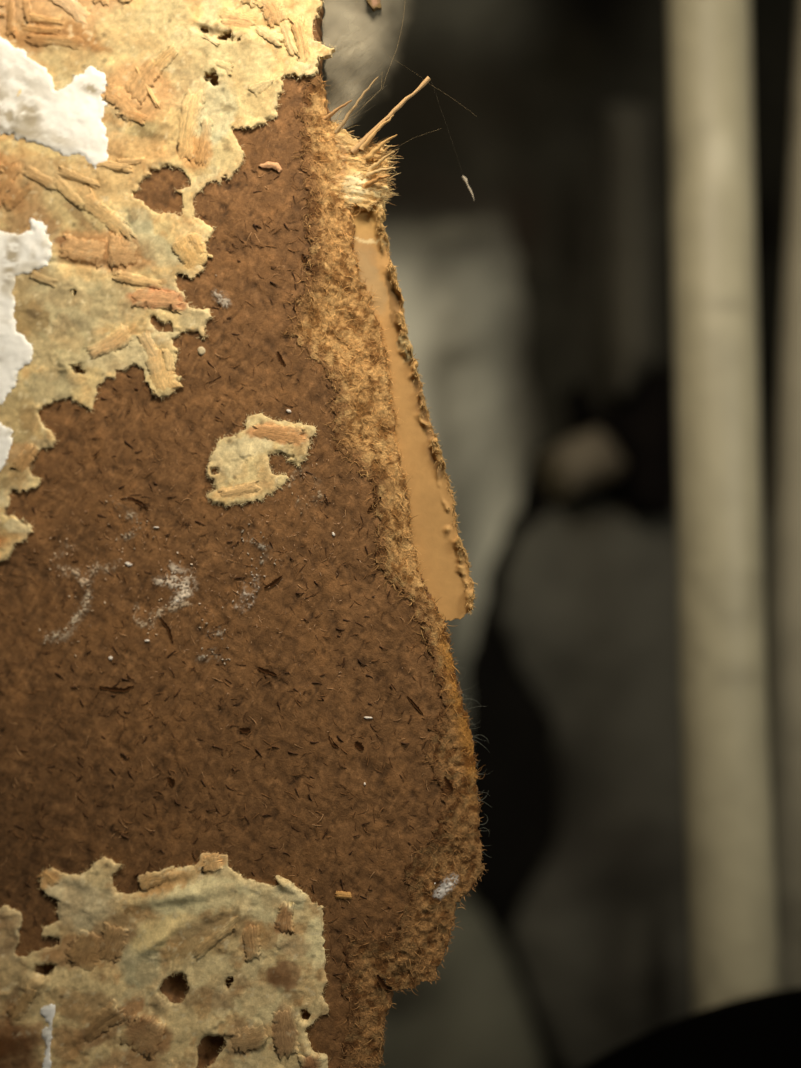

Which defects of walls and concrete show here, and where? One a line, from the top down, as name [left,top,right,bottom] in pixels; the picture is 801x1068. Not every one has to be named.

peeling [0,422,13,471]
peeling [0,218,53,406]
peeling [352,137,477,621]
peeling [40,1004,55,1068]